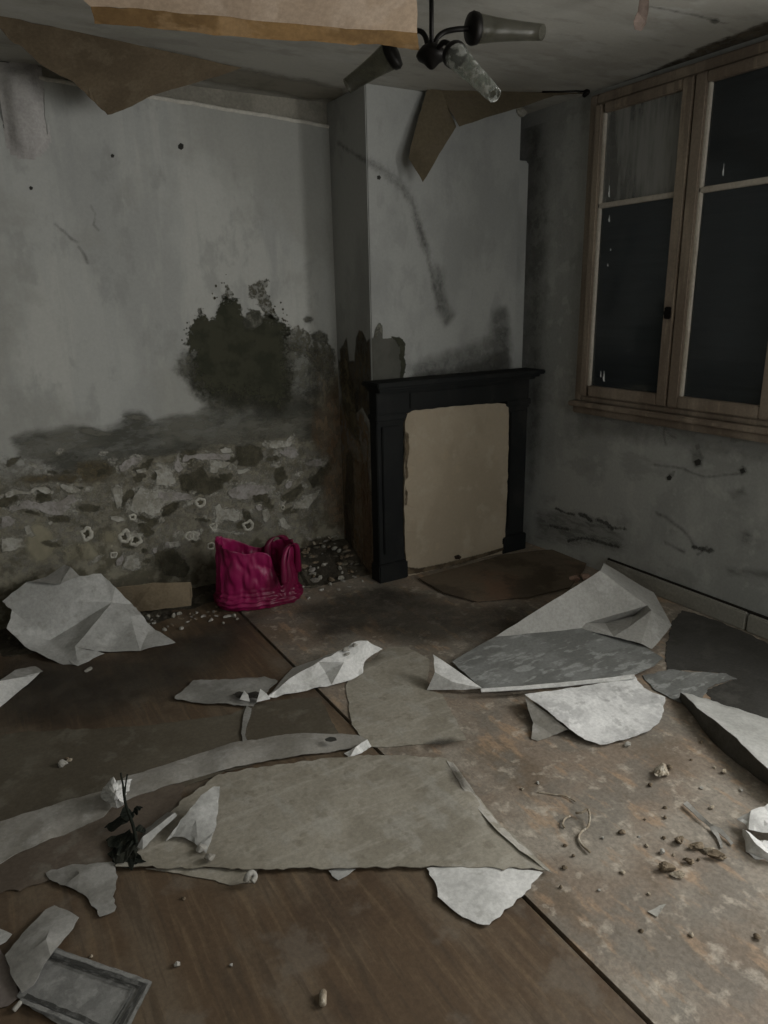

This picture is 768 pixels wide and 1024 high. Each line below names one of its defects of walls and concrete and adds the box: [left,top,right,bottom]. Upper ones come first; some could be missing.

peeling [0,433,341,578]
water stain [0,274,373,630]
crack [550,508,625,548]
crack [692,545,713,553]